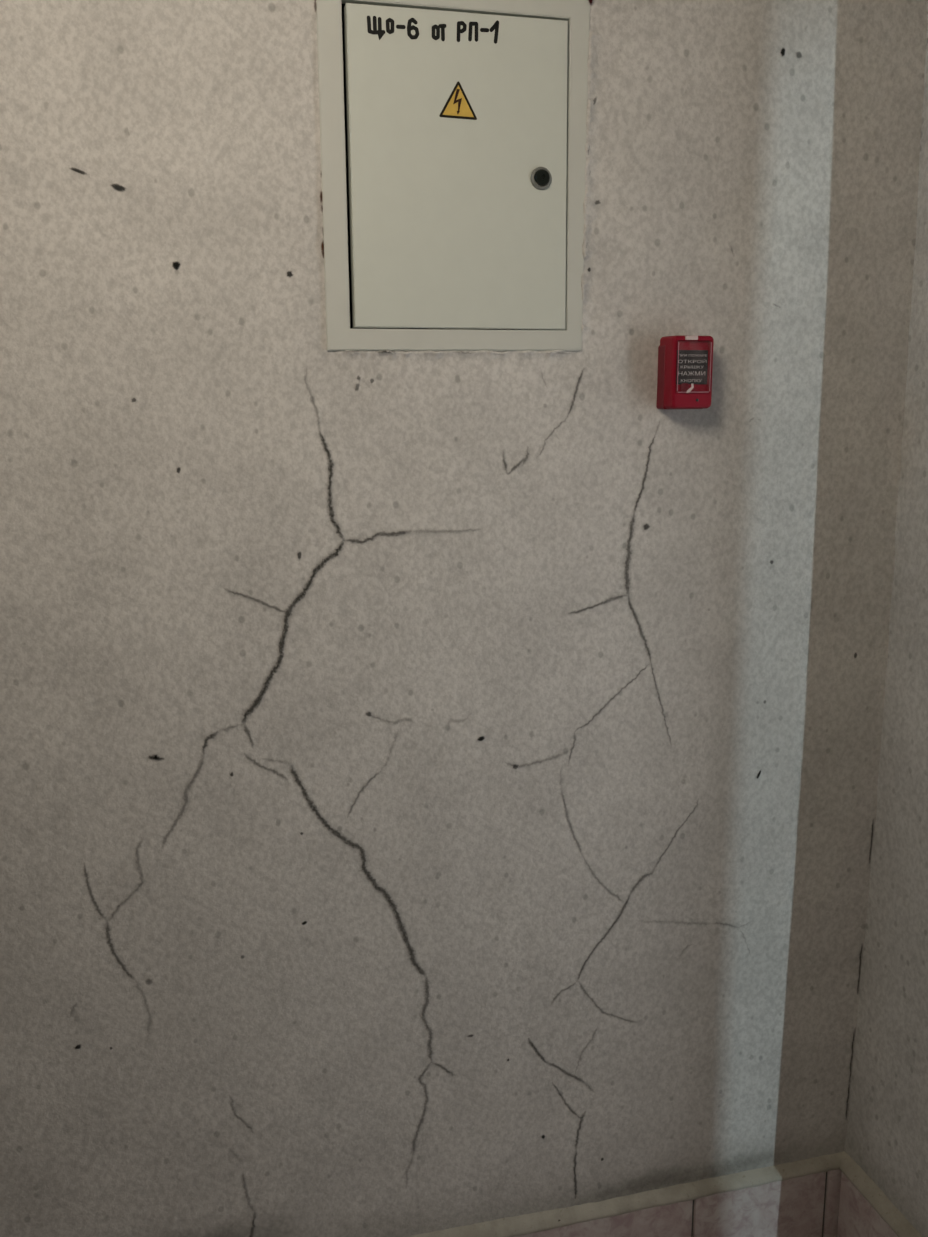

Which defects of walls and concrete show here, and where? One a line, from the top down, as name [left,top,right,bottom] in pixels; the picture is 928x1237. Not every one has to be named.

crack [243,435,406,742]
crack [574,438,654,728]
crack [84,869,131,976]
crack [291,768,449,1072]
crack [579,901,628,976]
crack [529,1042,579,1080]
crack [574,1117,583,1195]